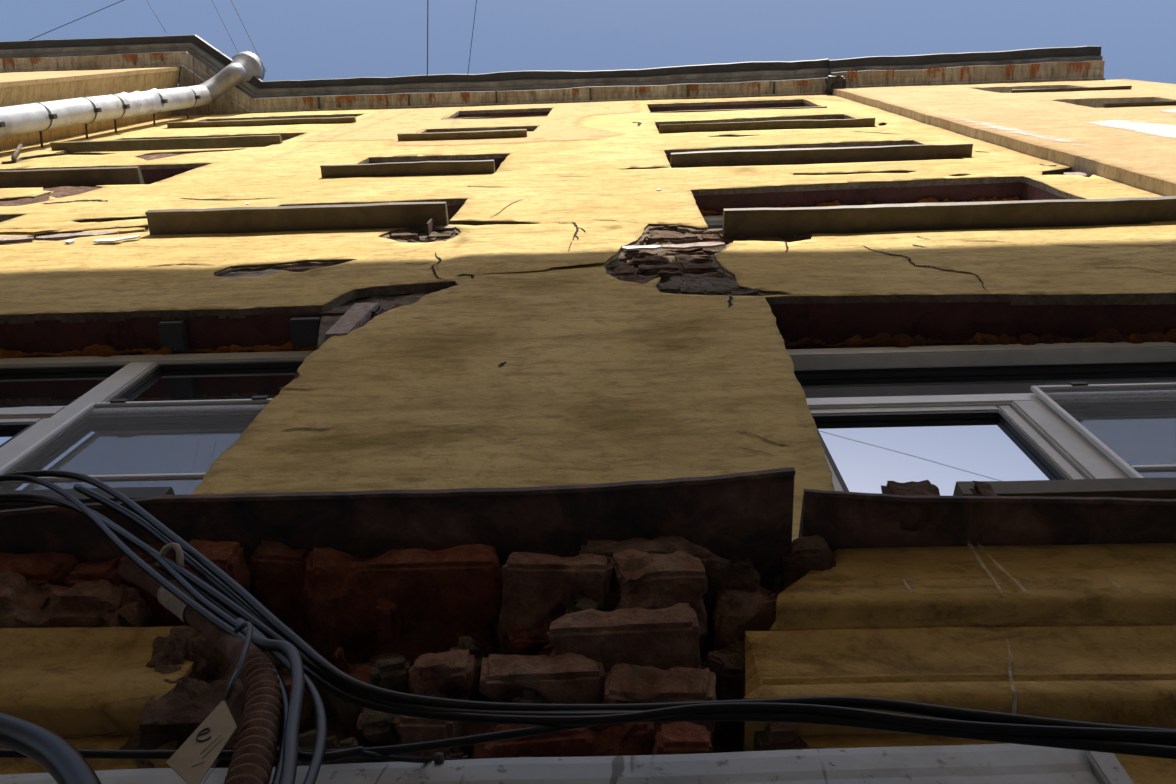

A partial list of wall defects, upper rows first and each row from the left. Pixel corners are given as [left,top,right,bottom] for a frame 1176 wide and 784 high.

spalling [214,261,349,277]
spalling [382,226,460,241]
crack [558,219,638,252]
spalling [606,226,746,292]
crack [862,236,992,295]
crack [1055,244,1176,275]
flaking render [0,535,837,704]
flaking render [276,662,743,766]